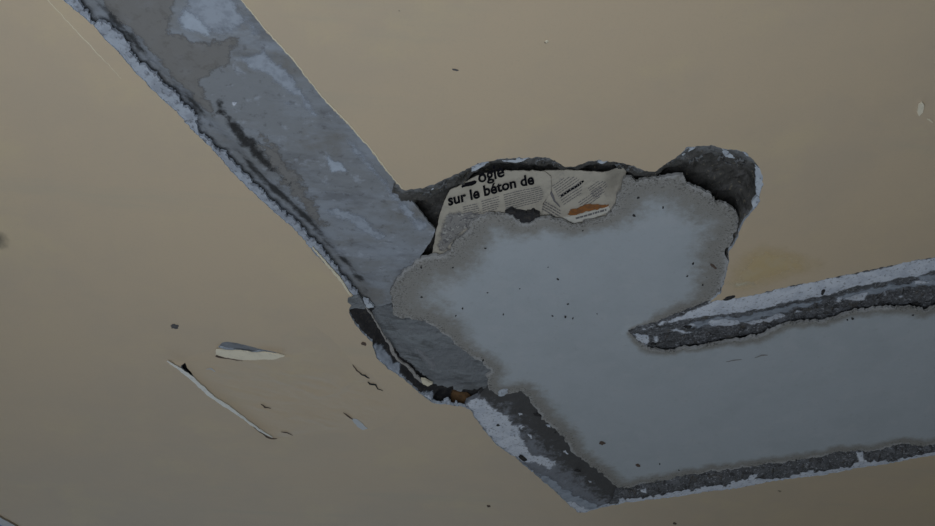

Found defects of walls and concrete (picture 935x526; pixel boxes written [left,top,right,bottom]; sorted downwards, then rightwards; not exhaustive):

spalling [65,0,763,386]
spalling [628,257,935,350]
peeling [432,385,935,512]